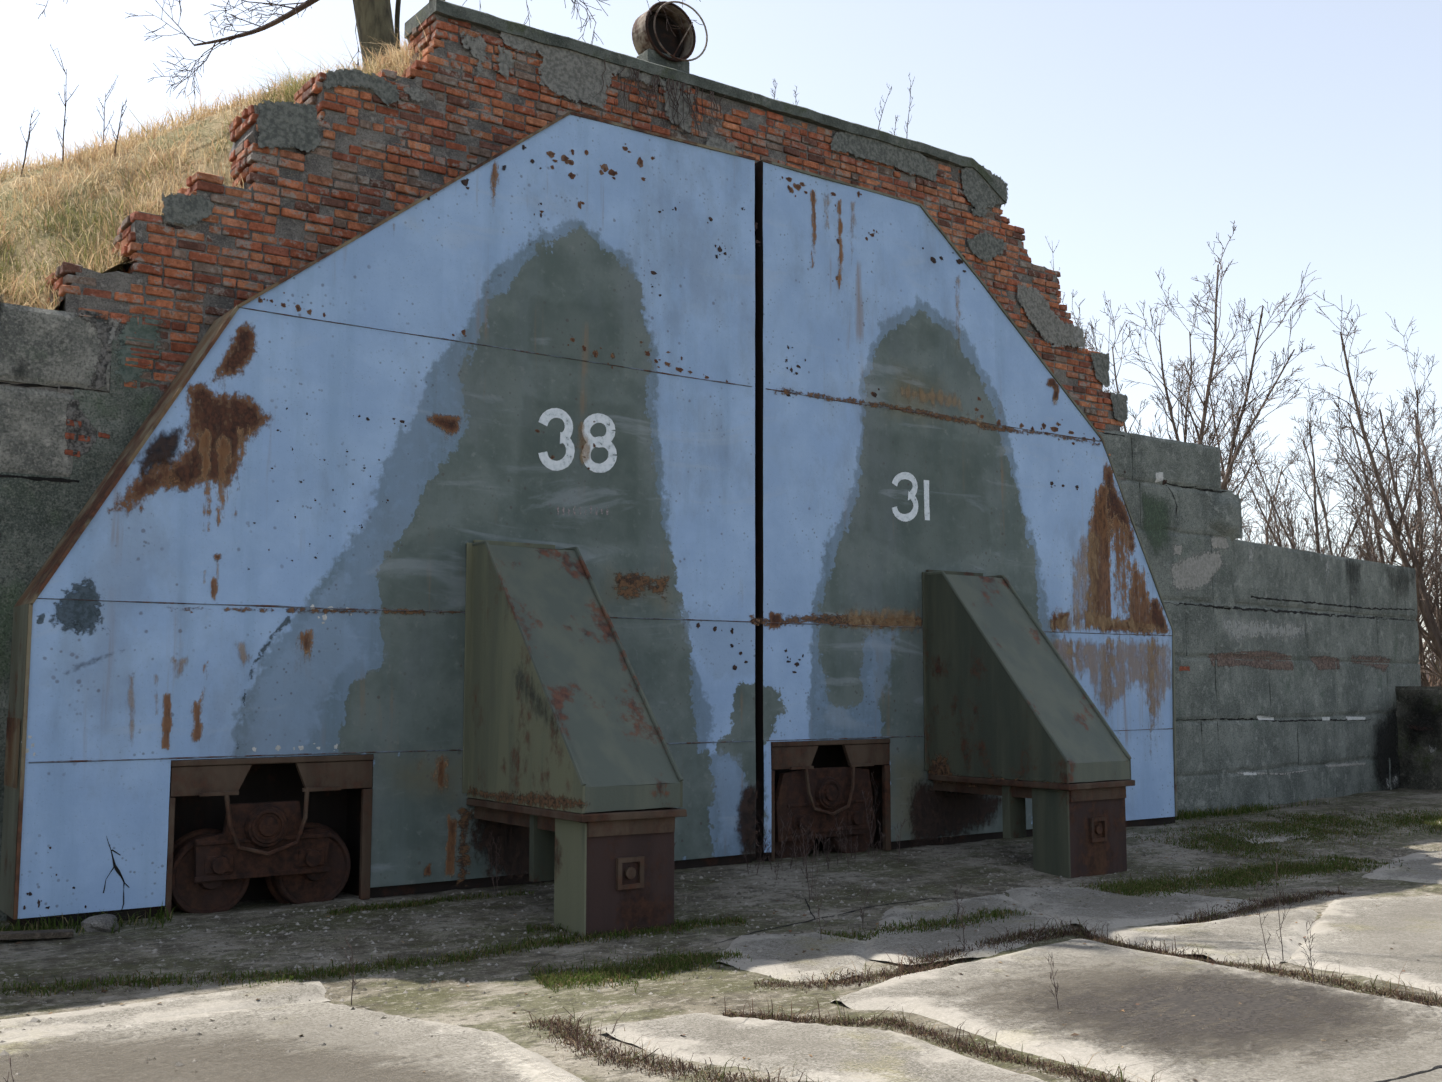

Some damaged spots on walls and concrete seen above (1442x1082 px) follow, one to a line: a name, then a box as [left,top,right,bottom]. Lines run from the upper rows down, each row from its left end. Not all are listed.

flaking render [324,68,432,106]
flaking render [161,192,216,229]
rust [811,189,854,289]
flaking render [922,166,1008,273]
flaking render [64,307,166,457]
rust [109,322,271,525]
rust [775,388,1100,445]
flaking render [1017,284,1128,422]
rust [750,610,922,629]
rust [1050,463,1170,717]
rust [162,693,172,750]
crack [103,836,129,914]